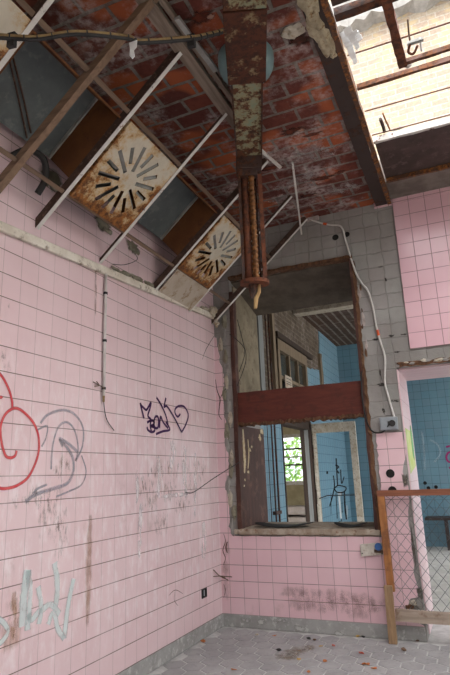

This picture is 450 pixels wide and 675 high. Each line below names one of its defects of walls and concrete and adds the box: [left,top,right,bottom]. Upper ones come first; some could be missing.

spalling [281,0,337,59]
flaking render [218,314,237,536]